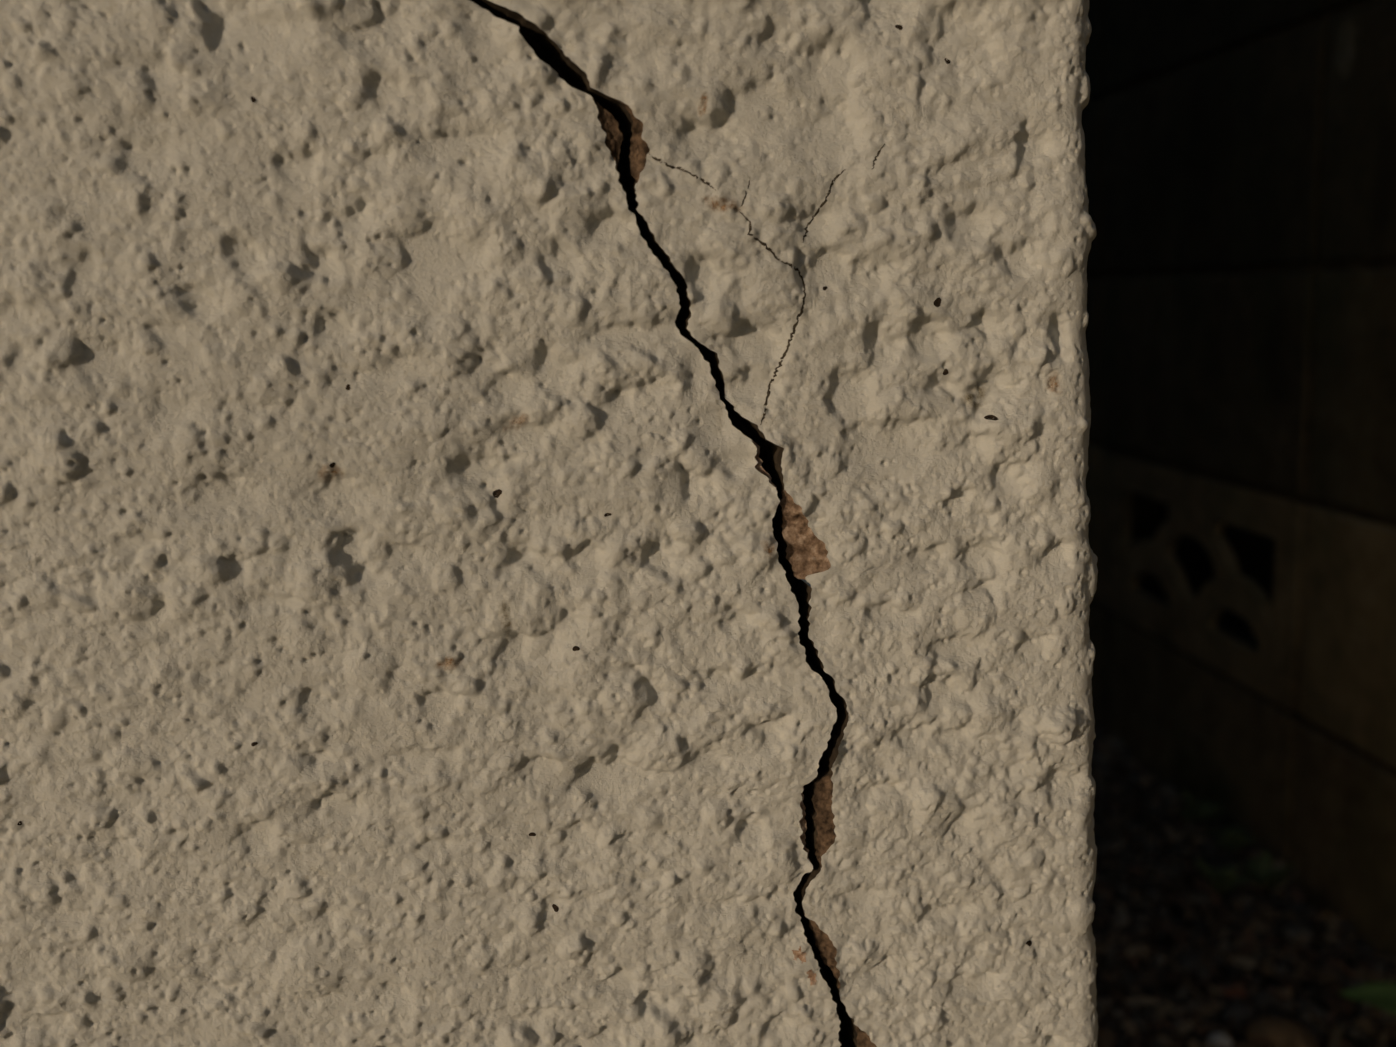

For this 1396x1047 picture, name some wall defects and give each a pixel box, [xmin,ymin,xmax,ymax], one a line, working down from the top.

crack [470,0,885,1047]